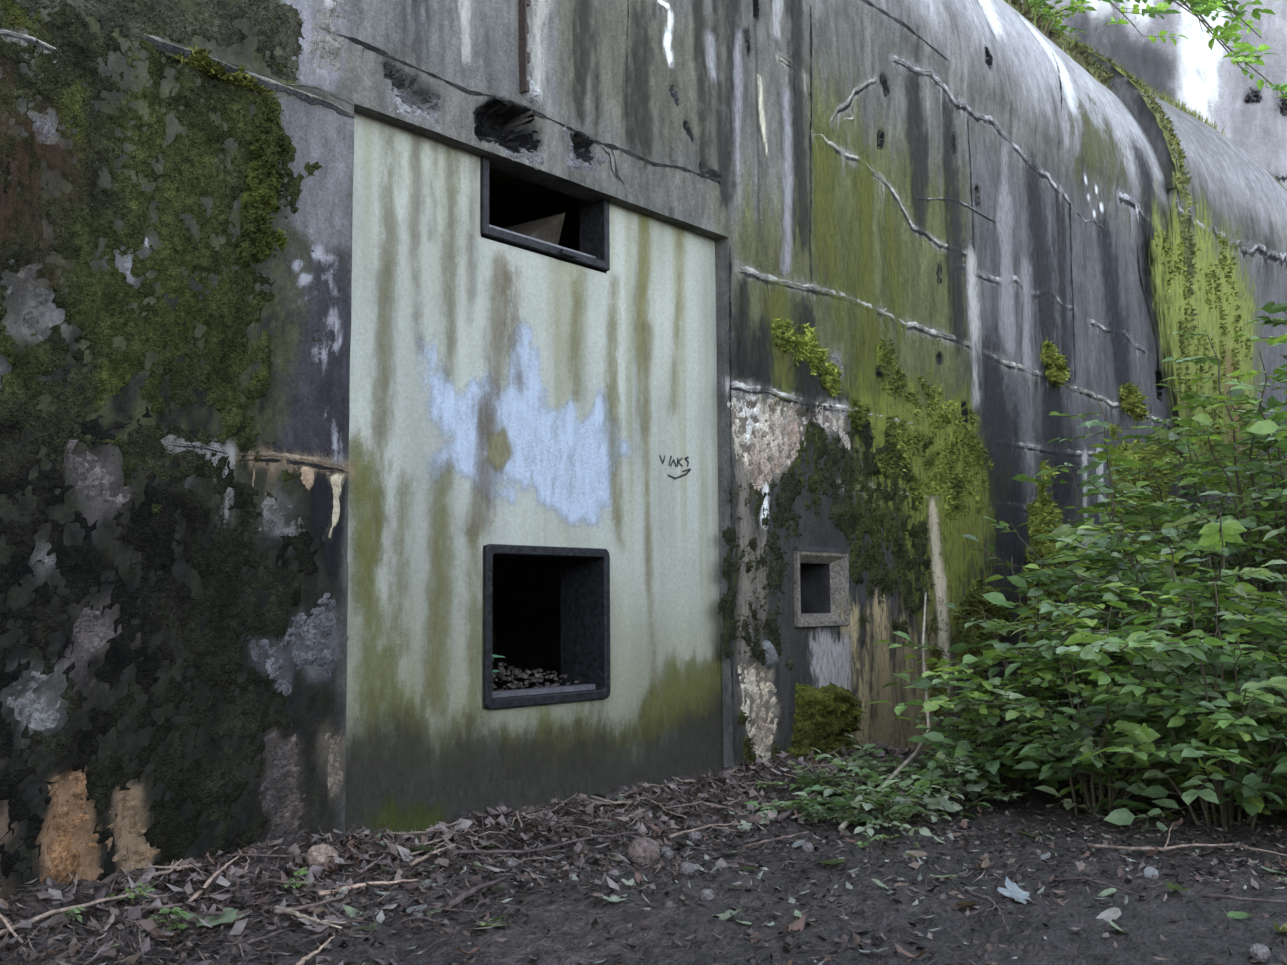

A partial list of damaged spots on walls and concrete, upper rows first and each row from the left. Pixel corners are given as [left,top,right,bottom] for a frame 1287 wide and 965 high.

spalling [473,97,544,170]
water stain [625,0,673,165]
water stain [694,0,767,206]
water stain [1021,17,1077,112]
water stain [733,0,906,429]
peeling [488,428,511,471]
peeling [727,391,850,491]
water stain [907,70,1104,573]
crack [729,0,1287,755]
peeling [249,593,348,696]
water stain [345,698,724,837]
peeling [738,659,778,760]